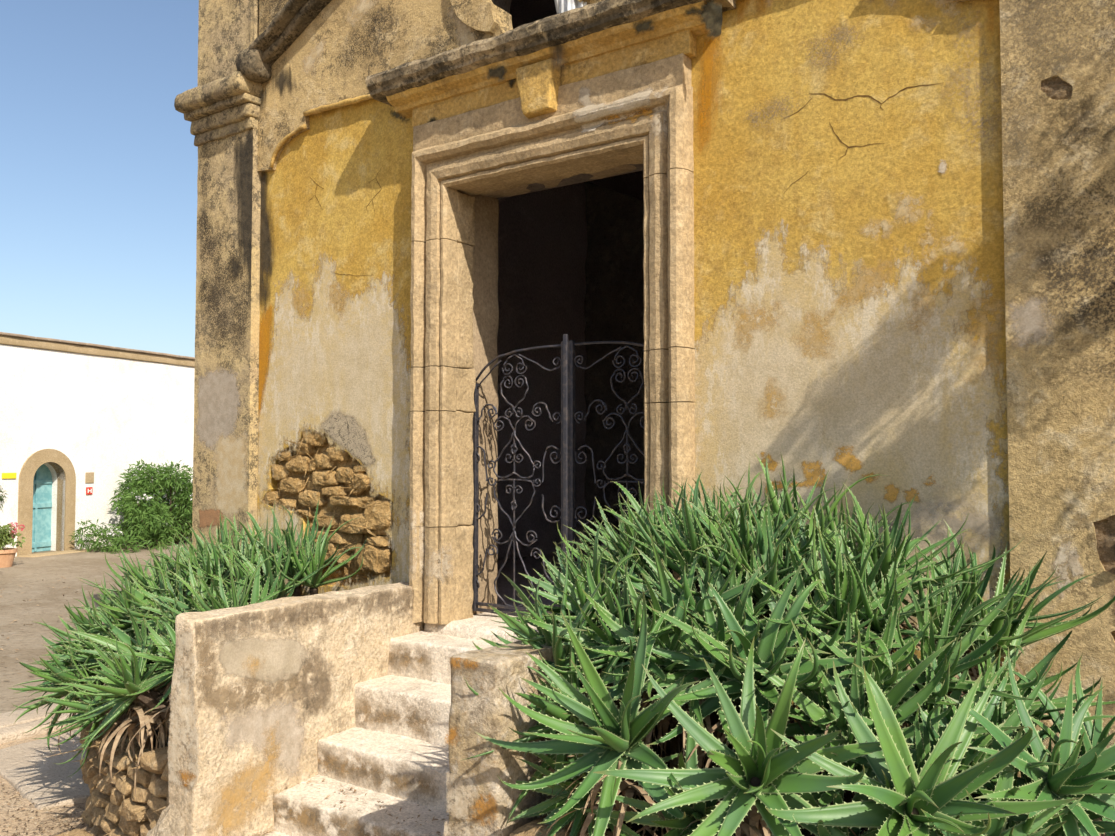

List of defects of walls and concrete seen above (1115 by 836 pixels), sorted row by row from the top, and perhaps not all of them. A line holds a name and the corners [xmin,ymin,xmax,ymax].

leakage [260,70,292,107]
leakage [341,11,387,69]
crack [783,83,941,159]
leakage [960,0,1115,154]
leakage [201,130,274,351]
leakage [1025,181,1115,370]
peeling [199,254,412,595]
peeling [693,195,1009,651]
spalling [1094,515,1115,574]